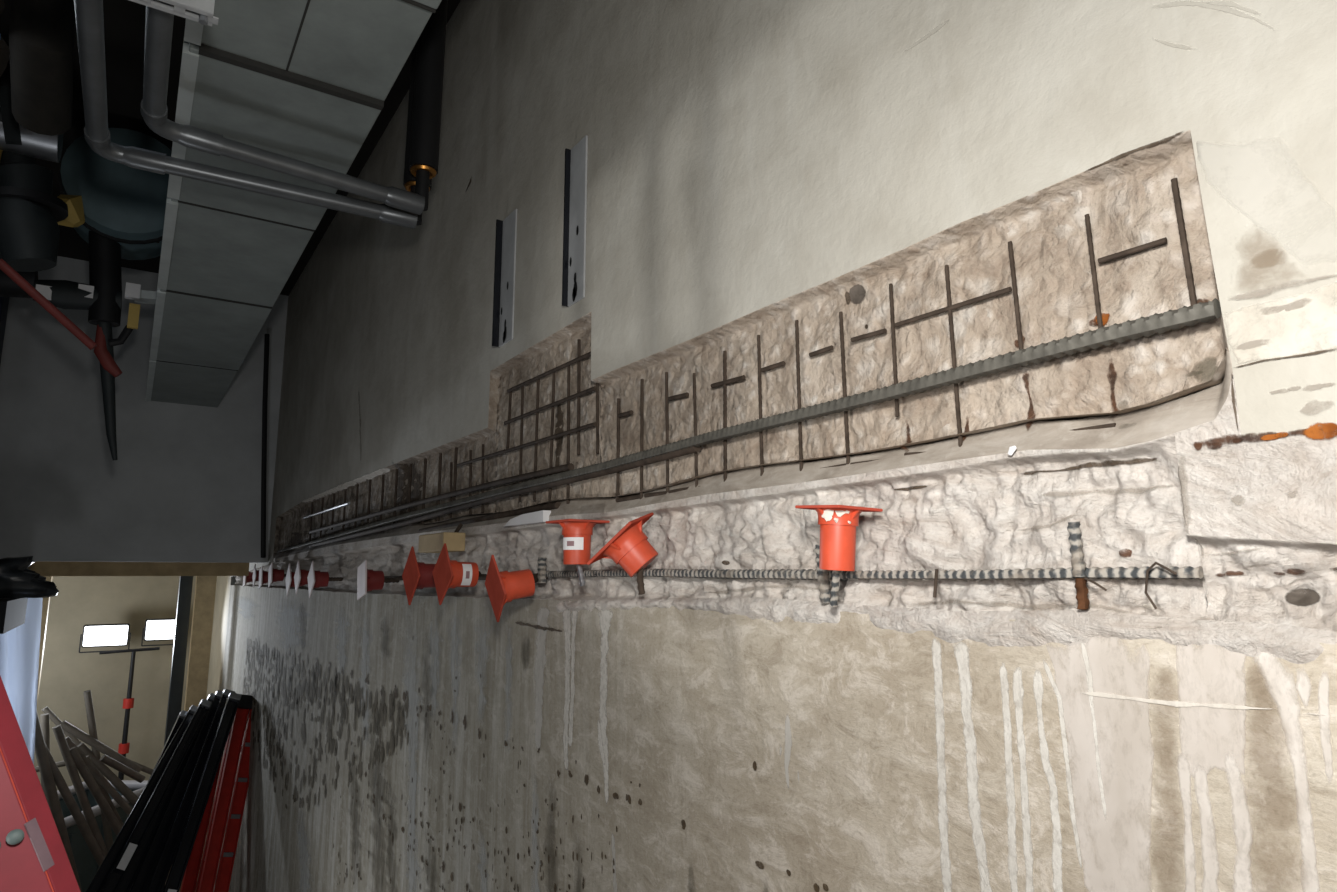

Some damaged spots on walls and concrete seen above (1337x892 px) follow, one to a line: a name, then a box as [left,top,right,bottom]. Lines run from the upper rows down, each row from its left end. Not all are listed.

spalling [234,130,1337,645]
rust [1194,423,1337,450]
damp [373,635,458,892]
damp [598,609,613,803]
damp [932,639,992,892]
damp [1000,636,1154,892]
damp [1177,644,1333,892]